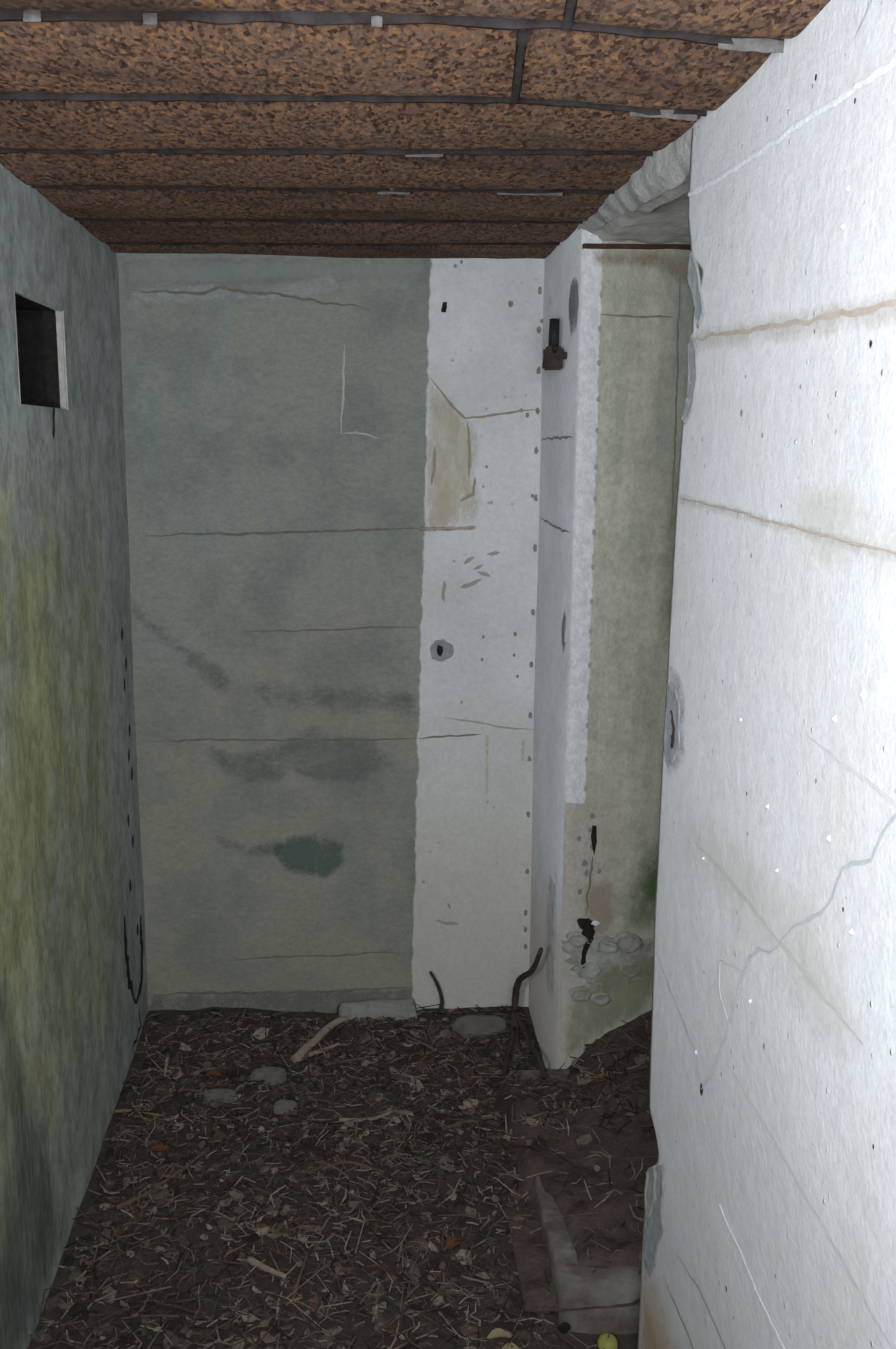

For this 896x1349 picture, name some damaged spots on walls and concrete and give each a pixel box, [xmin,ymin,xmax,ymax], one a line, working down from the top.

rust [678,497,896,554]
leakage [276,837,342,876]
crack [656,737,896,1349]